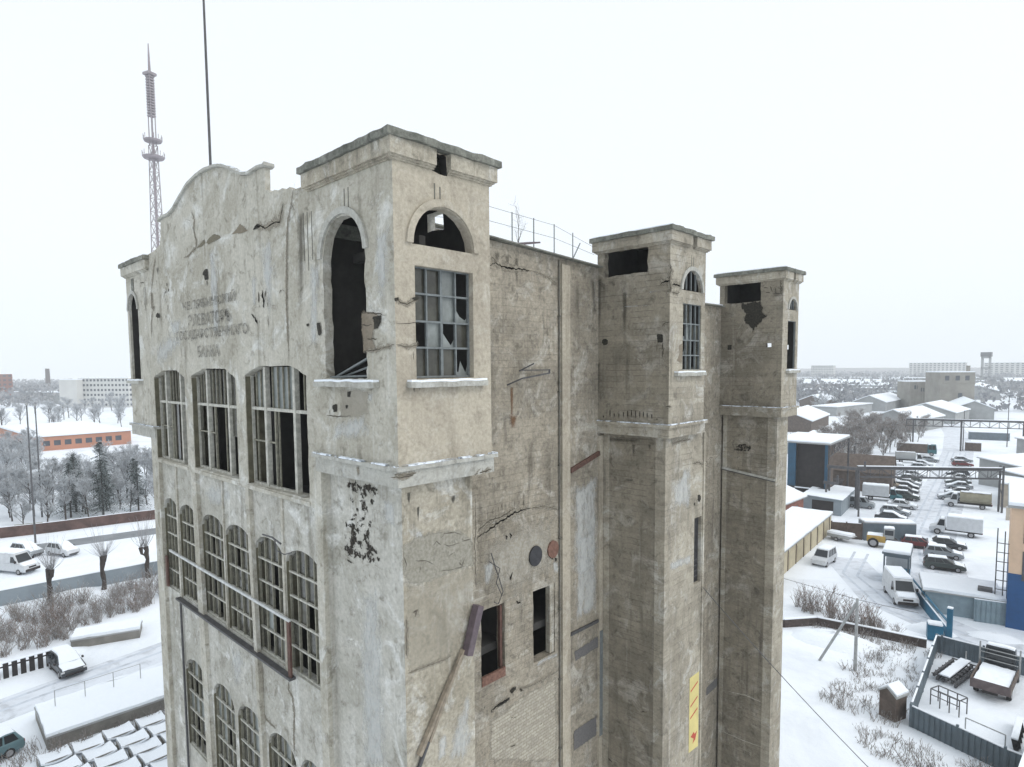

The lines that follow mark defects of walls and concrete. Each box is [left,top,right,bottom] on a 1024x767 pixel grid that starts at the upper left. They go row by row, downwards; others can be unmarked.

crack [186,214,205,257]
crack [490,257,556,283]
peeling [741,280,782,332]
spalling [361,312,382,352]
peeling [344,480,380,564]